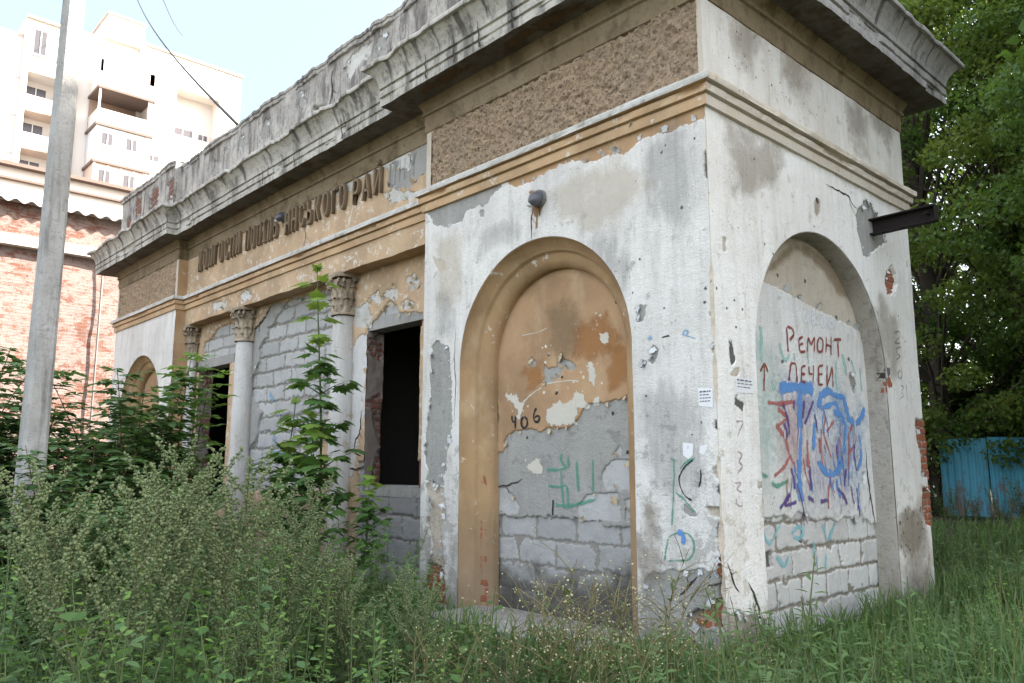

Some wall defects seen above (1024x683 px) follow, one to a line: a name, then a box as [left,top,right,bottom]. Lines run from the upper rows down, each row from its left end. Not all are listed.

peeling [330,144,427,205]
peeling [428,107,705,228]
crack [827,184,856,212]
flaking render [856,200,887,258]
flaking render [885,266,896,295]
peeling [350,274,421,479]
flaking render [424,340,453,605]
flaking render [480,312,880,658]
flaking render [899,420,937,557]